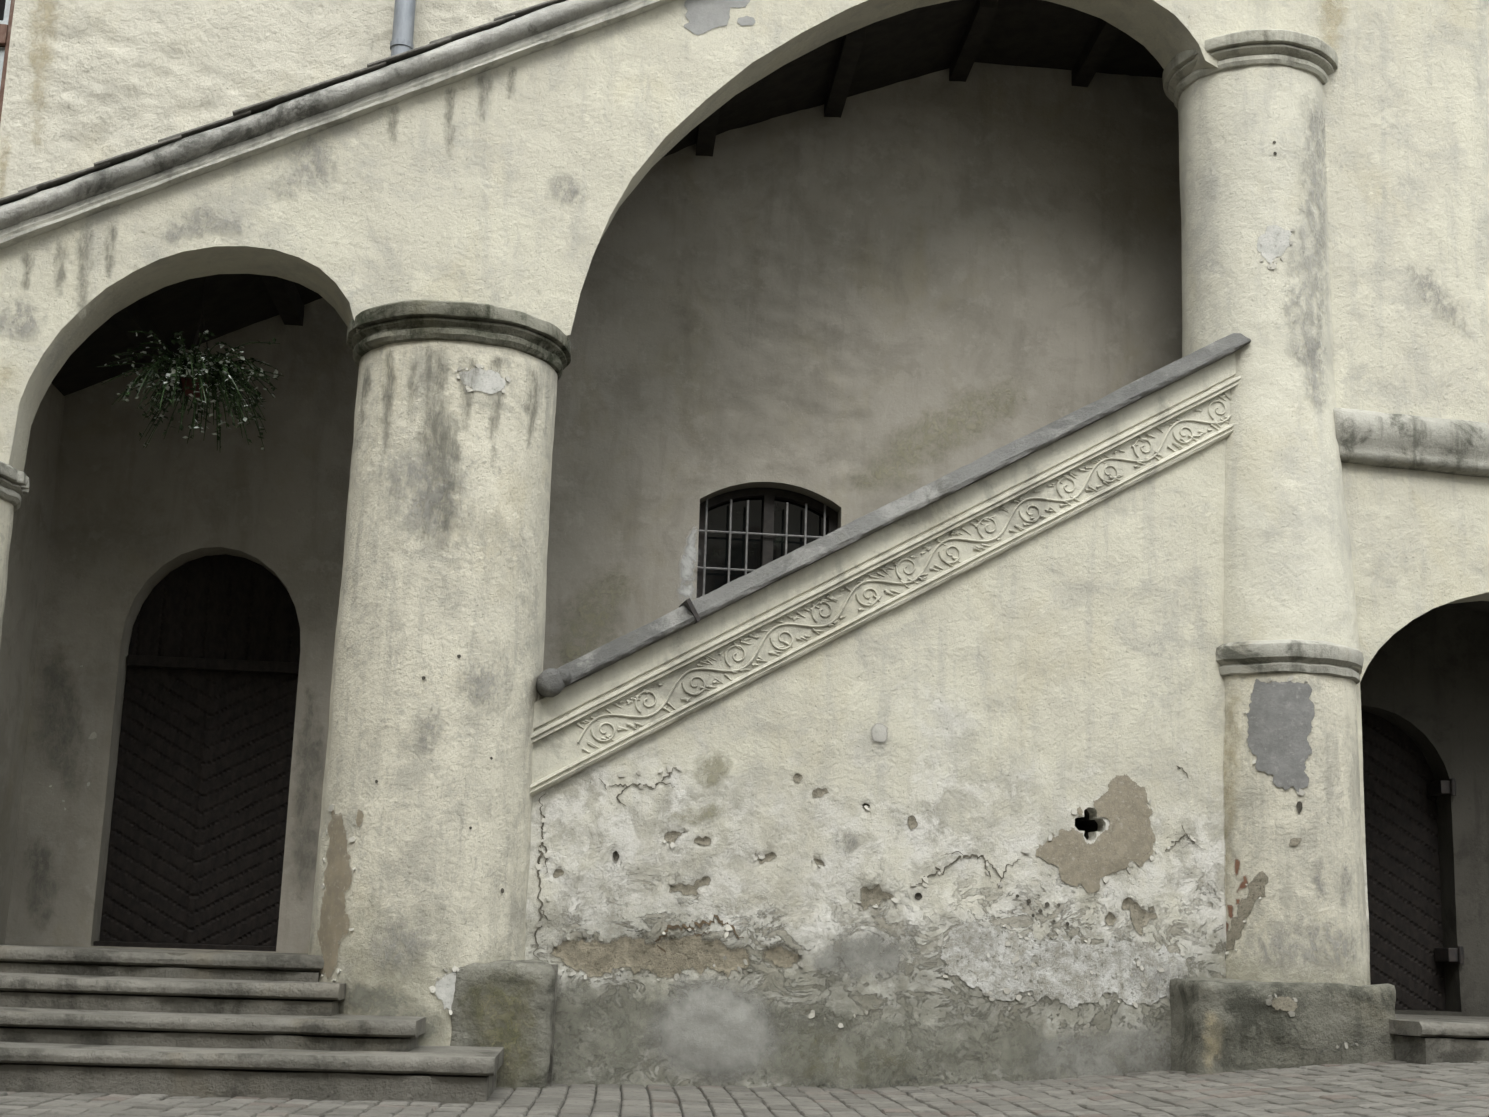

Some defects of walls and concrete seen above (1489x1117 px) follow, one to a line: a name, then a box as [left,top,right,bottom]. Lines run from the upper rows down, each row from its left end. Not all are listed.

damp [1291,112,1324,400]
damp [362,353,472,527]
crack [600,765,682,806]
crack [1165,826,1196,851]
peeling [317,804,364,982]
flaking render [856,884,922,911]
crack [910,851,1021,888]
flaking render [551,932,804,981]
peeling [937,894,1188,1009]